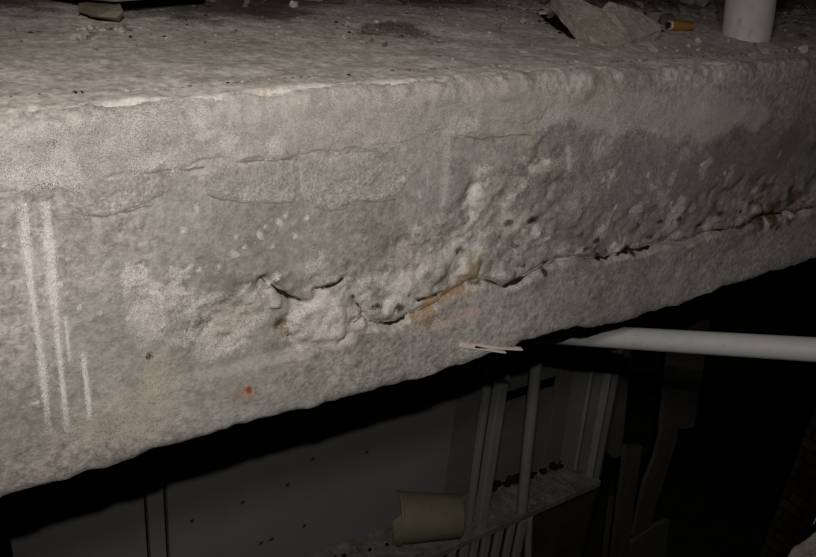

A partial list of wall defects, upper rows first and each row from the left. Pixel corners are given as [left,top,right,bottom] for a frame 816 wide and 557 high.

leakage [0,200,192,471]
crack [260,277,343,301]
rust [401,256,482,332]
spalling [339,152,816,337]
crack [350,206,814,325]